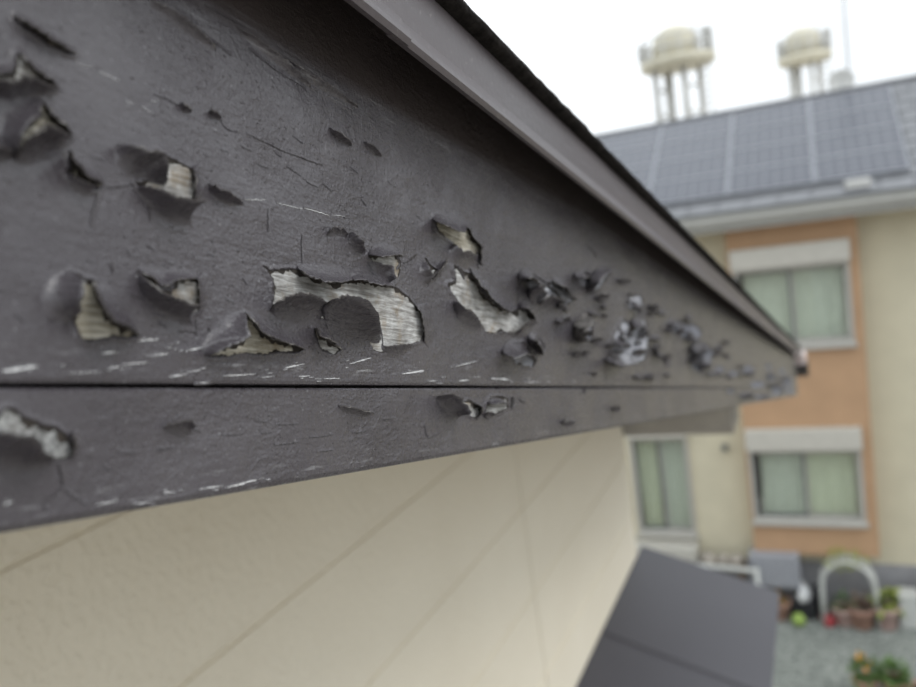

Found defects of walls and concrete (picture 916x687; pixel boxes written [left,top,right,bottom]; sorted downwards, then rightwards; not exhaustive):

peeling [0,46,77,167]
peeling [115,144,244,228]
peeling [40,207,794,401]
peeling [0,401,89,510]
peeling [437,393,525,421]